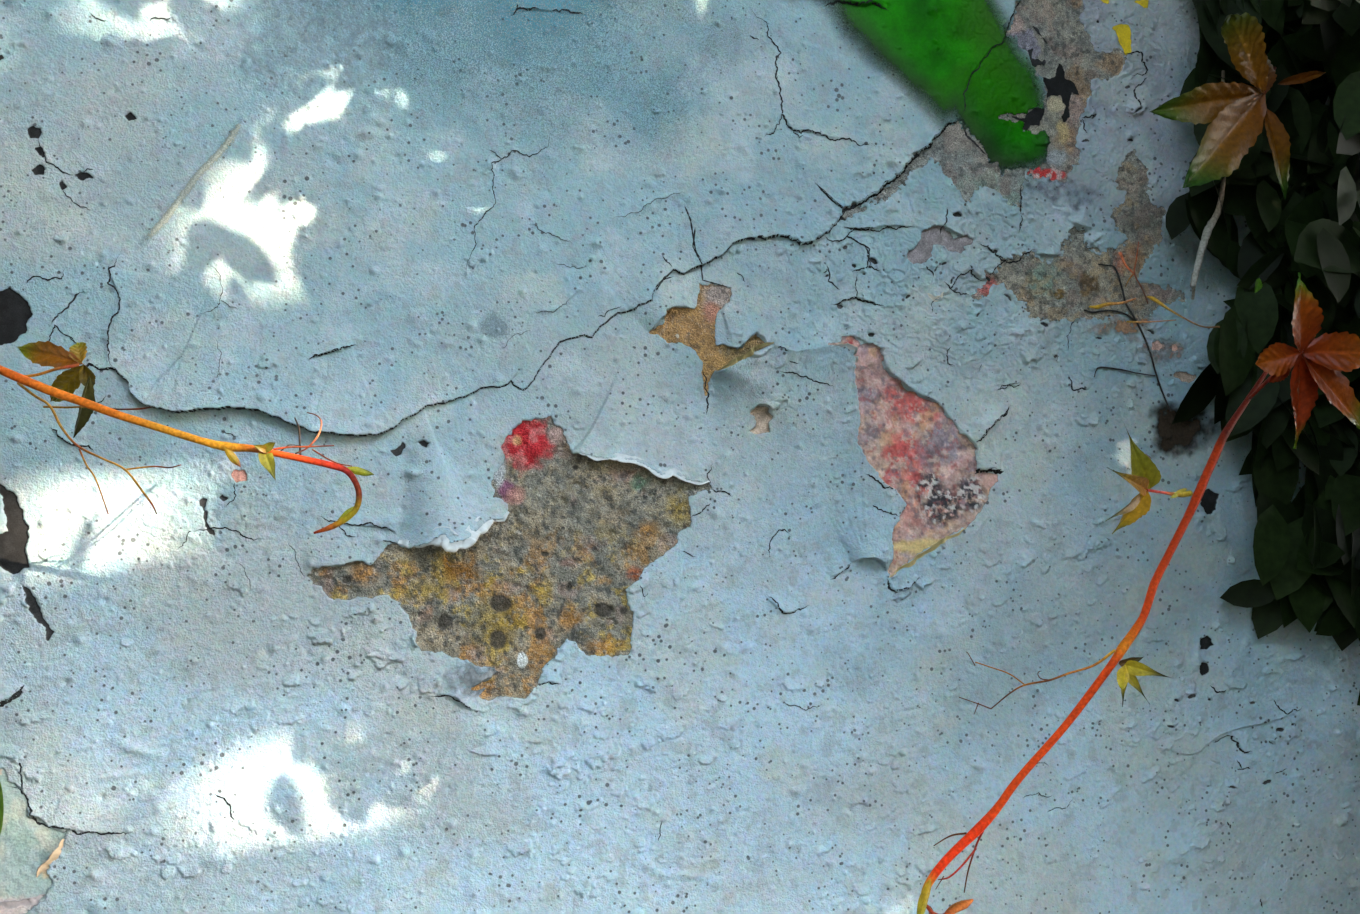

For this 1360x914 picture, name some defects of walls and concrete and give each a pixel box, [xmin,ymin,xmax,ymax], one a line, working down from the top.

crack [50,427,94,451]
spalling [308,416,711,701]
crack [27,0,1032,437]
peeling [649,283,774,396]
peeling [828,333,998,578]
crack [946,347,1021,474]
spalling [840,0,1130,272]
spalling [971,139,1186,351]